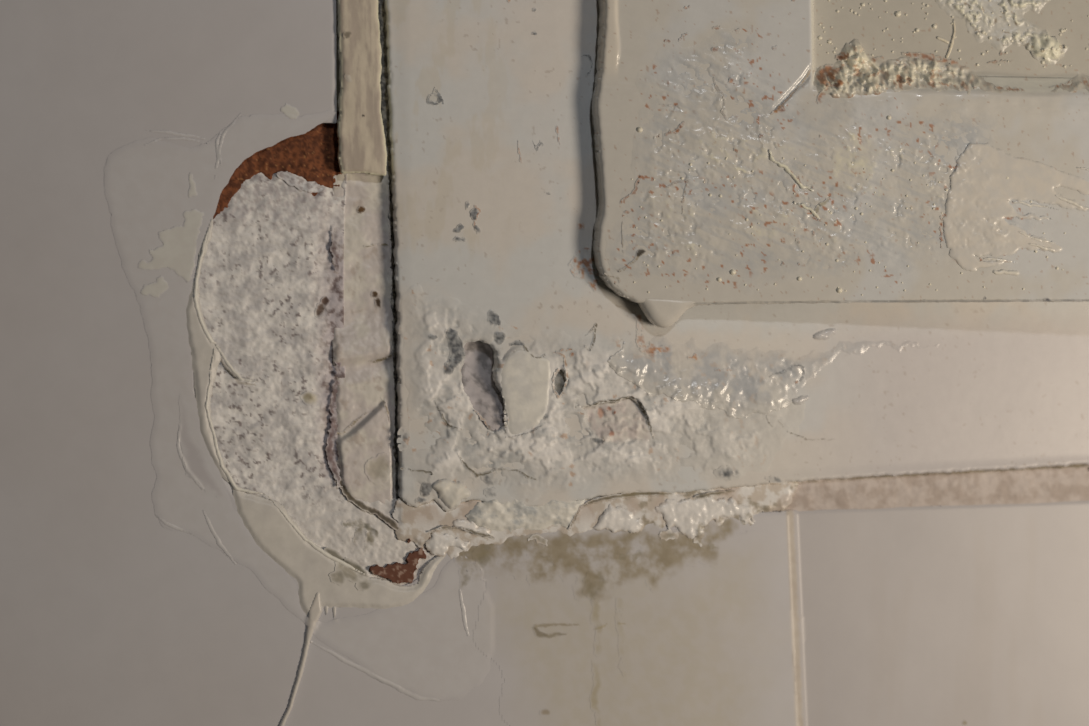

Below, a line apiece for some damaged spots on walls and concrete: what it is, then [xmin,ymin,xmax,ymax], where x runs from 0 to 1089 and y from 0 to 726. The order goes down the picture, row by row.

peeling [453,201,481,242]
corrosion [568,247,599,292]
spalling [186,111,445,615]
peeling [429,328,465,375]
peeling [488,309,553,434]
crack [576,396,654,439]
peeling [714,465,742,481]
crack [798,464,1089,484]
water stain [453,512,810,726]